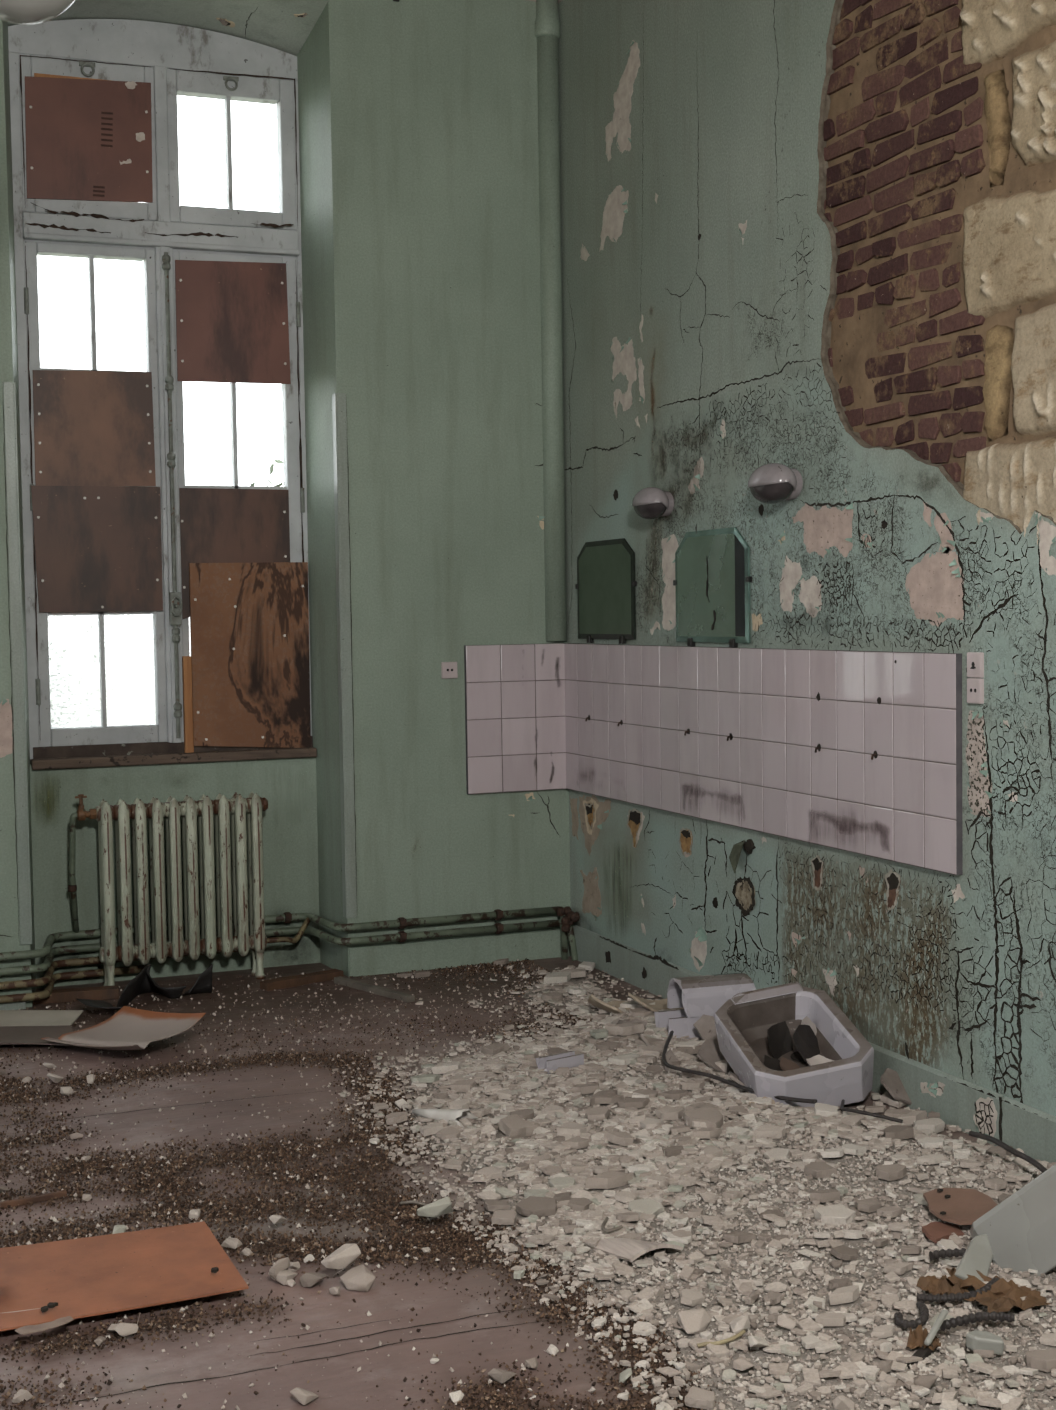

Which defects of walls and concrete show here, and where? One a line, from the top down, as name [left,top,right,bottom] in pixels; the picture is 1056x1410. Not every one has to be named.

peeling [605,40,640,161]
peeling [580,185,629,261]
spalling [817,0,1056,576]
peeling [611,315,648,427]
crack [535,279,642,622]
crack [600,0,1056,1119]
peeling [778,502,888,618]
peeling [905,502,964,627]
peeling [0,698,14,758]
peeling [579,795,611,856]
spalling [627,808,645,848]
spalling [679,828,693,857]